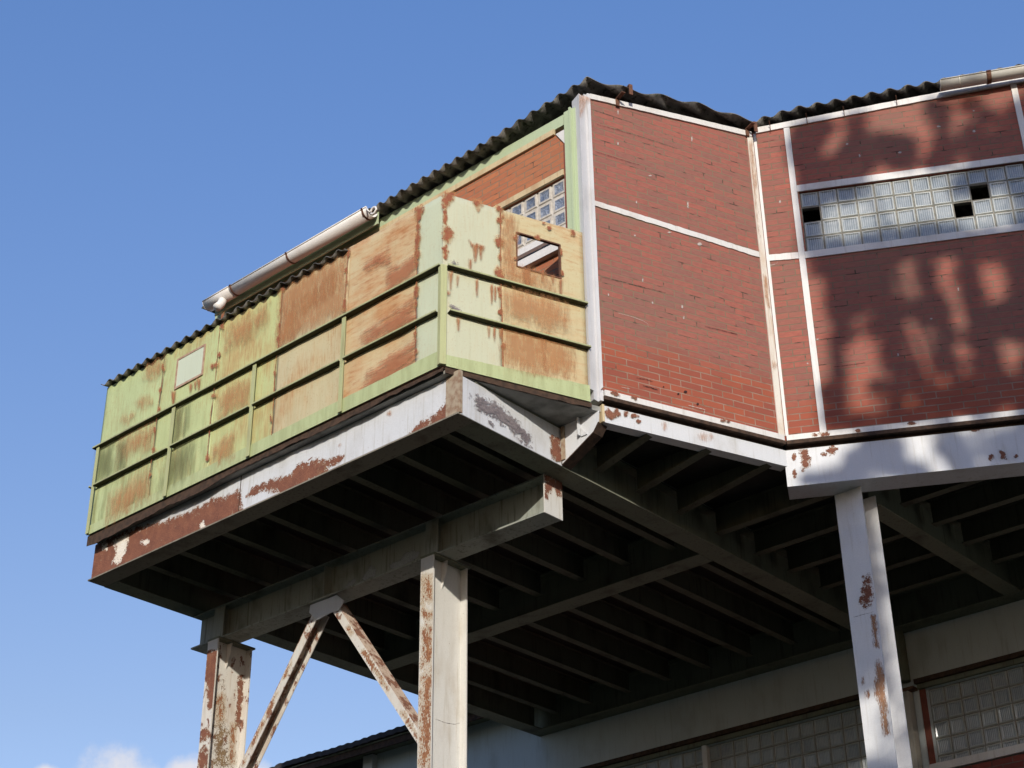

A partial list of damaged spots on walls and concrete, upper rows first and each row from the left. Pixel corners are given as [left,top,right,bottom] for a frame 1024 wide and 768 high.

rust [441,192,455,259]
rust [469,205,571,374]
rust [270,249,351,435]
peeling [471,393,533,448]
rust [601,387,641,423]
rust [792,431,838,478]
peeling [101,531,150,565]
rust [91,455,345,578]
rust [859,574,879,648]
rust [197,649,246,768]
rust [402,575,433,768]
rust [862,663,890,736]